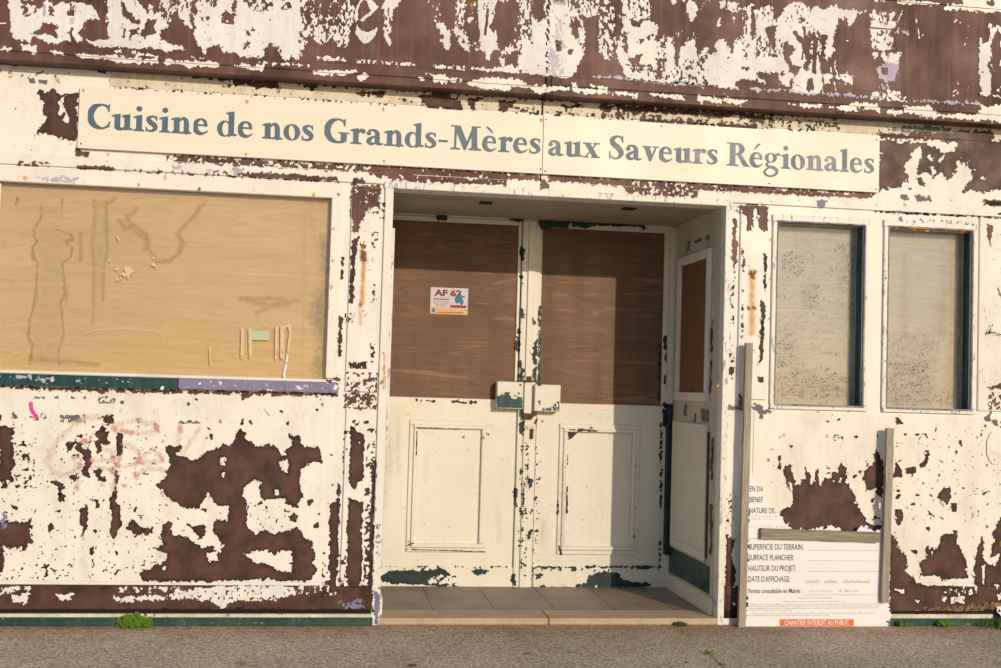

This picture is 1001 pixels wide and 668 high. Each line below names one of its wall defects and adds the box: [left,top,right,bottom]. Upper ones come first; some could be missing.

peeling [0,343,661,625]
peeling [495,306,541,410]
peeling [658,335,667,508]
rust [747,270,757,335]
peeling [774,383,1001,616]